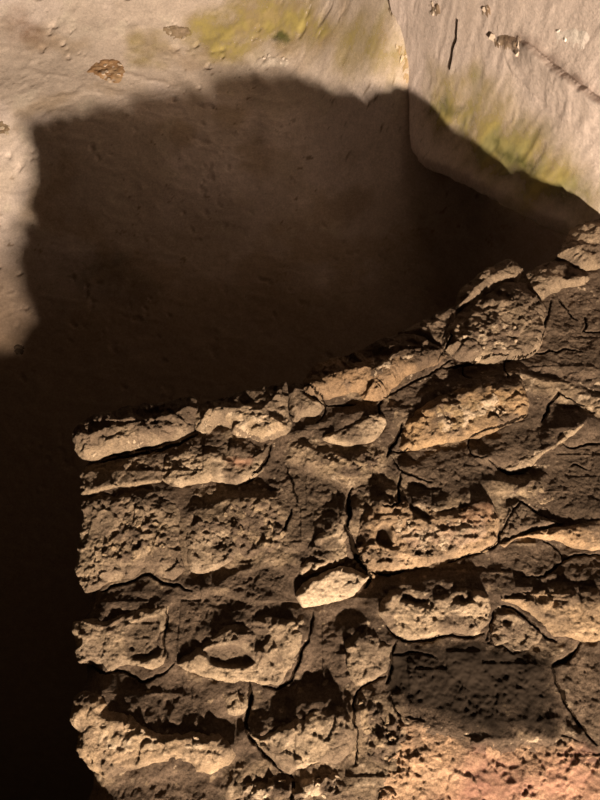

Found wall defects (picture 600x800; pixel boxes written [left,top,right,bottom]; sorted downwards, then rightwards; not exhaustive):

peeling [163,25,192,40]
crack [449,20,458,70]
peeling [87,59,125,83]